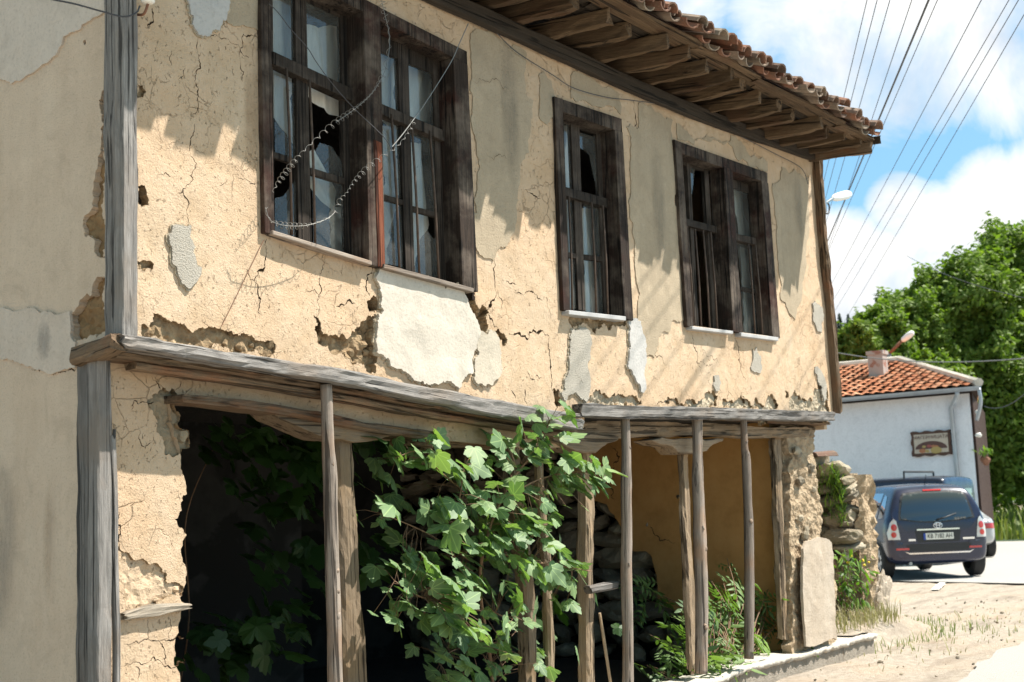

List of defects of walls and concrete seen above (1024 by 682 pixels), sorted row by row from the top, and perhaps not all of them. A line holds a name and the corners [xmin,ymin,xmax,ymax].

crack [159,34,257,222]
spalling [83,89,105,258]
spalling [141,312,276,357]
crack [247,239,267,314]
crack [306,255,373,334]
peeling [314,269,503,390]
crack [482,259,552,404]
peeling [559,71,824,406]
spalling [147,388,190,457]
spalling [657,366,830,426]
spalling [118,545,183,611]
crack [125,620,183,677]